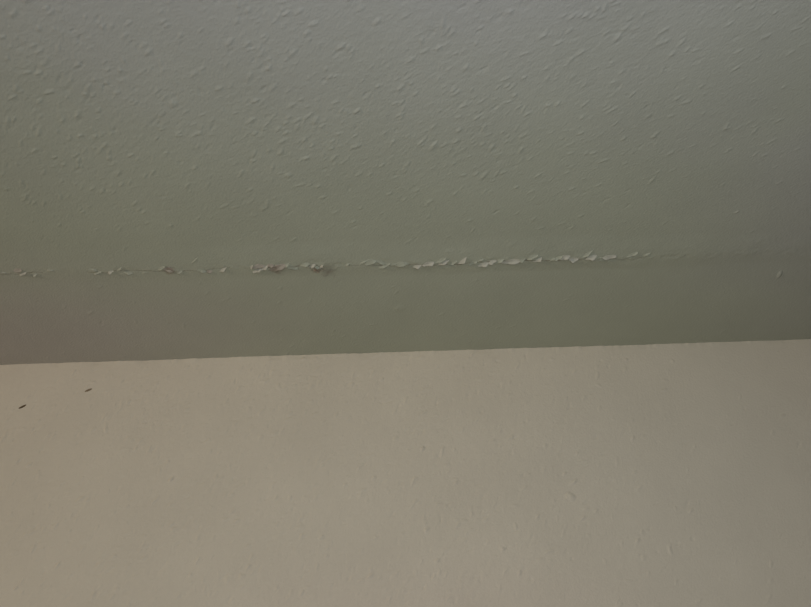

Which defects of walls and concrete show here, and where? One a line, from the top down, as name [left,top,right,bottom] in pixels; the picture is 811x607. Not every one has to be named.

peeling [345,250,651,269]